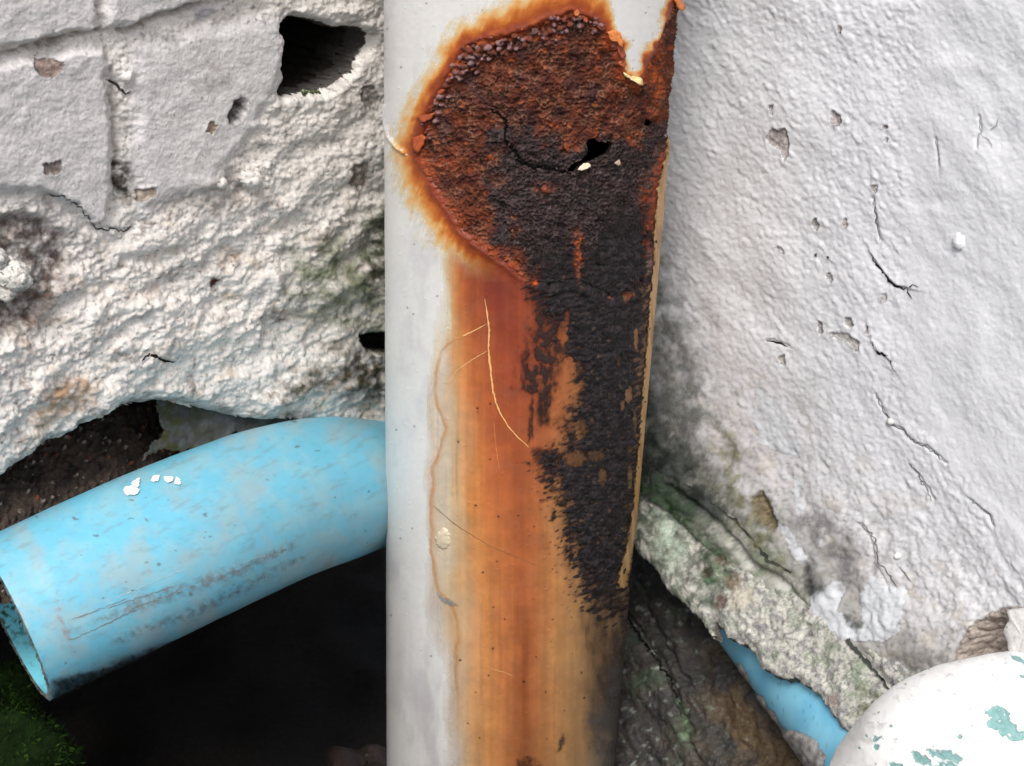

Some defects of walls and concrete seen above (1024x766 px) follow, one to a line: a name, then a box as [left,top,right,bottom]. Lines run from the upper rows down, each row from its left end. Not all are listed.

spalling [279,16,347,96]
spalling [206,100,243,134]
crack [49,194,132,232]
crack [872,199,918,298]
crack [142,353,176,363]
rust [389,0,686,766]
damp [640,284,725,519]
spalling [750,491,809,563]
damp [806,565,824,595]
damp [825,543,856,576]
peeling [810,576,907,642]
crack [846,638,890,690]